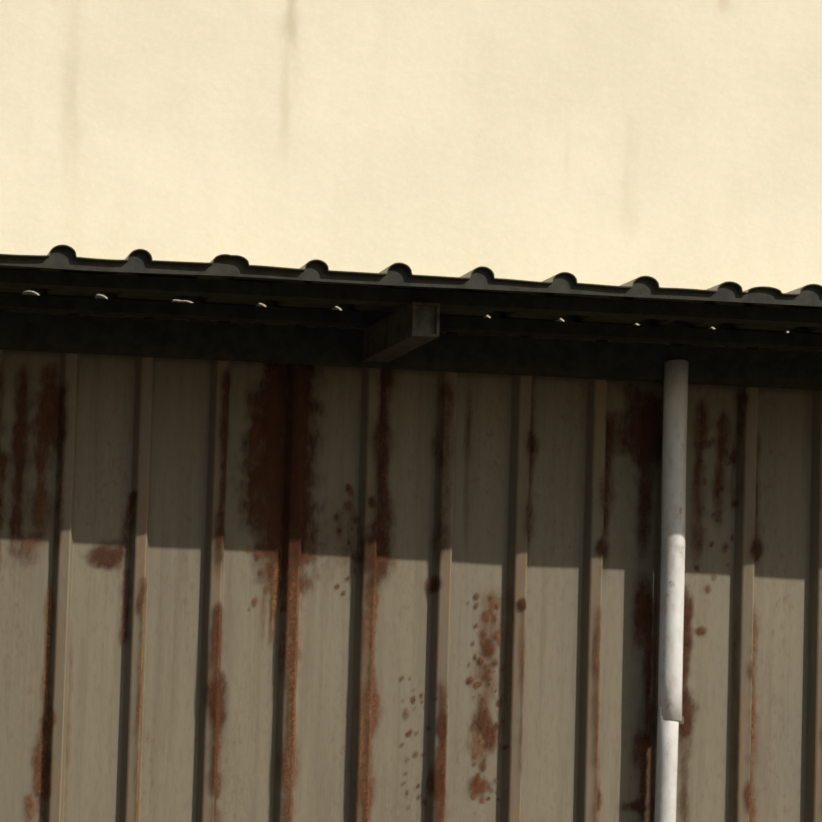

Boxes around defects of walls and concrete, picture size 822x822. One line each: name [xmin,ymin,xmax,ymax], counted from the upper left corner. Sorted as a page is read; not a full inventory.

rust [0,367,66,556]
rust [27,589,56,821]
rust [90,492,146,642]
rust [208,603,226,816]
rust [216,371,230,562]
rust [241,363,322,822]
rust [356,369,394,822]
rust [468,593,526,802]
rust [596,384,663,556]
rust [624,582,655,822]
rust [678,588,706,821]
rust [745,613,758,822]